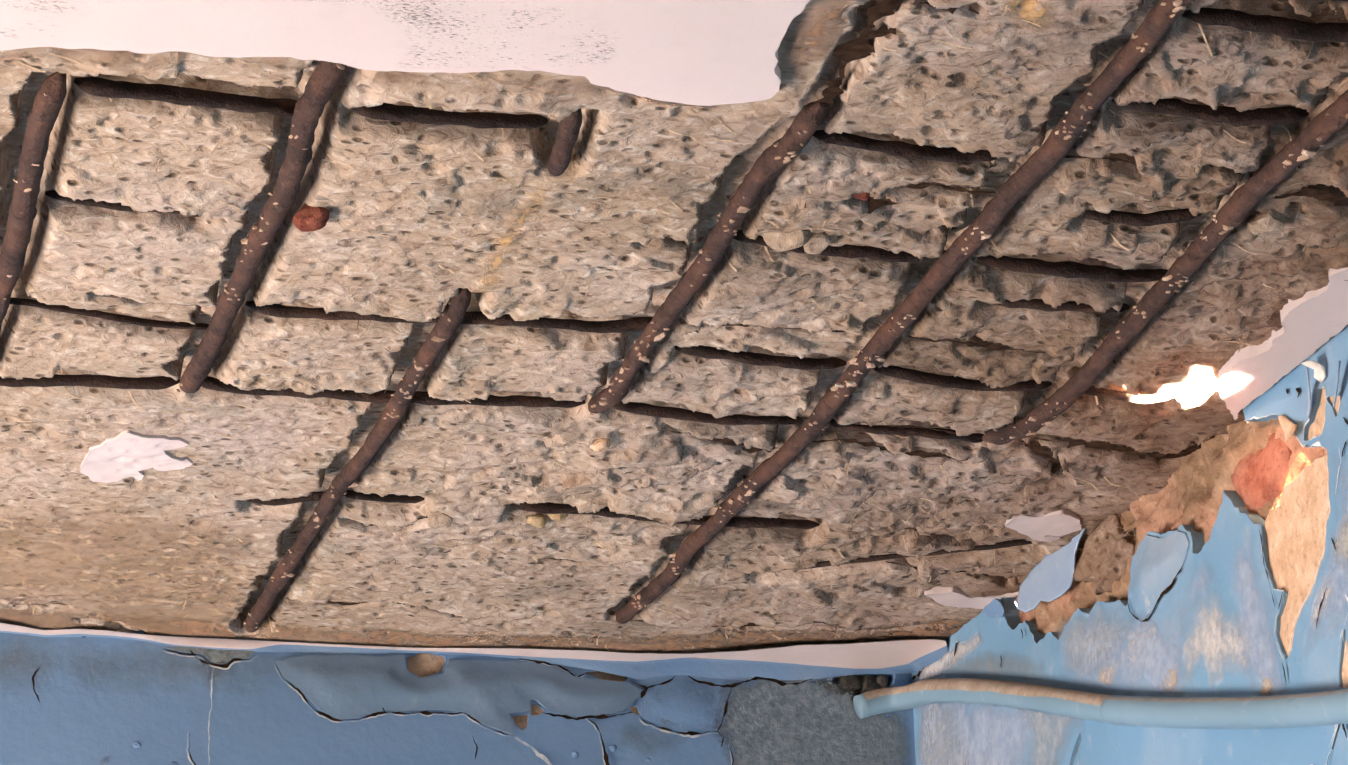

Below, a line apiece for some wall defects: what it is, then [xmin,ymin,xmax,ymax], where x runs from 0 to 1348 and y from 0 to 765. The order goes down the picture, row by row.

spalling [1187,0,1348,23]
spalling [0,47,320,325]
peeling [1301,360,1341,441]
crack [1335,417,1348,493]
flaking render [1014,415,1331,657]
crack [32,665,41,702]
crack [164,649,552,765]
spalling [404,641,445,677]
spalling [512,704,543,730]
crack [517,658,585,677]
spalling [585,671,626,682]
crack [542,676,813,765]